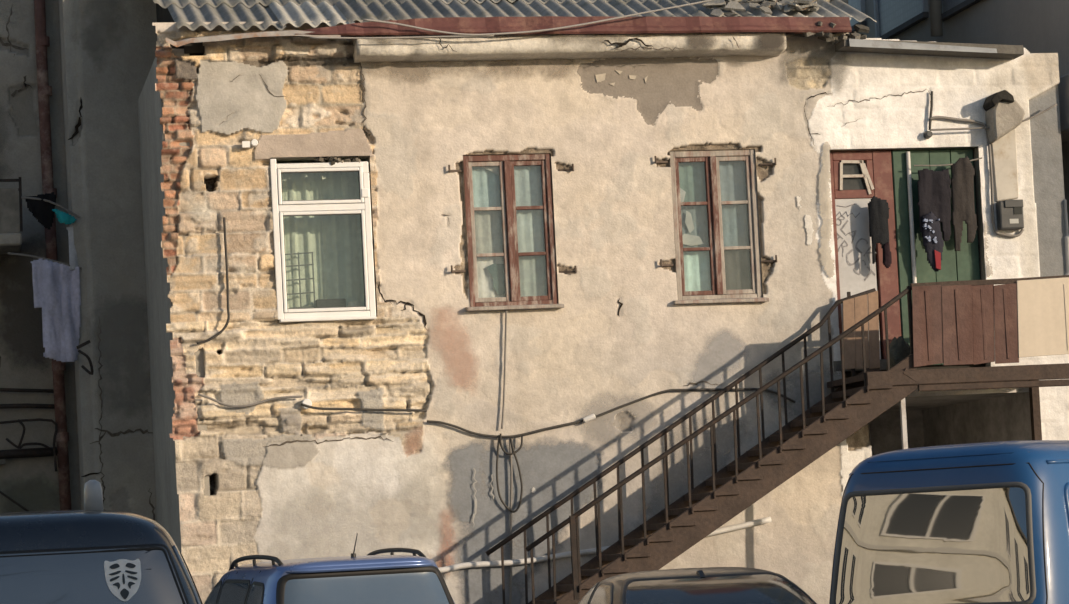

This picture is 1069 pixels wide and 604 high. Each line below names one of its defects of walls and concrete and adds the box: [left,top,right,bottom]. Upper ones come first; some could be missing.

crack [68,98,83,140]
peeling [577,57,719,126]
flaking render [155,46,194,275]
crack [378,282,427,330]
crack [81,320,153,510]
flaking render [169,338,204,439]
damp [695,333,743,386]
crack [147,489,155,521]
damp [447,441,600,604]